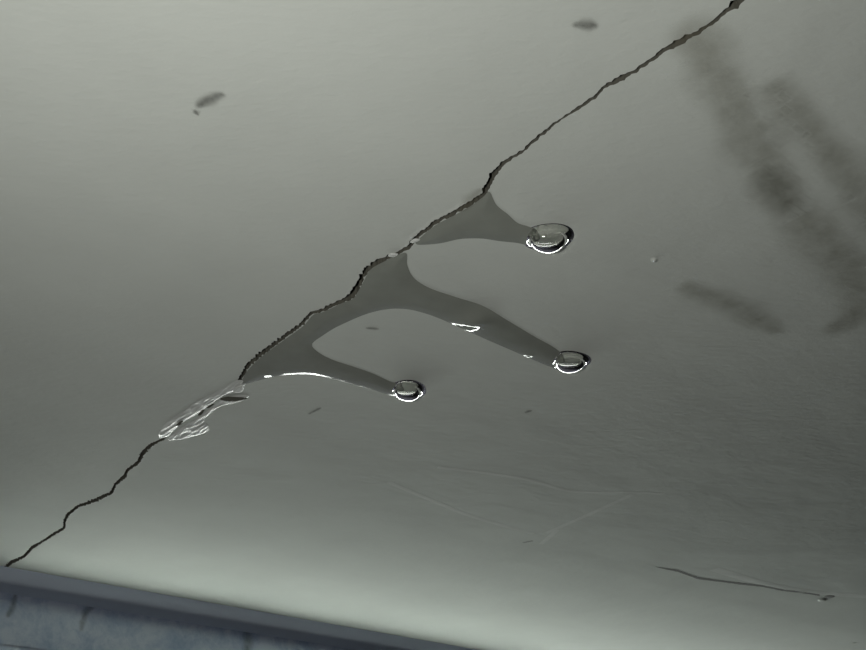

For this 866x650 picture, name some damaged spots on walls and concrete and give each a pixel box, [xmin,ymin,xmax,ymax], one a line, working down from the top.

crack [235,0,744,380]
damp [416,192,574,254]
damp [242,253,591,402]
crack [5,436,168,567]